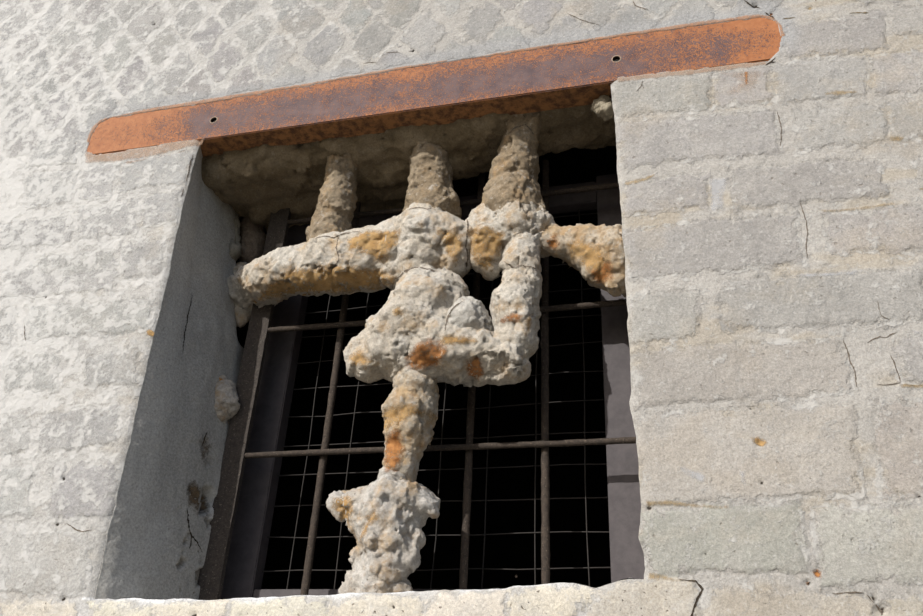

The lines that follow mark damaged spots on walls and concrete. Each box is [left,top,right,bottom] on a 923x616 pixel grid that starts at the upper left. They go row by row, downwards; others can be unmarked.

rust [461,15,784,60]
rust [87,60,447,163]
crack [799,199,808,255]
crack [843,303,921,386]
spalling [187,481,208,511]
crack [680,579,703,616]
crack [833,591,883,616]